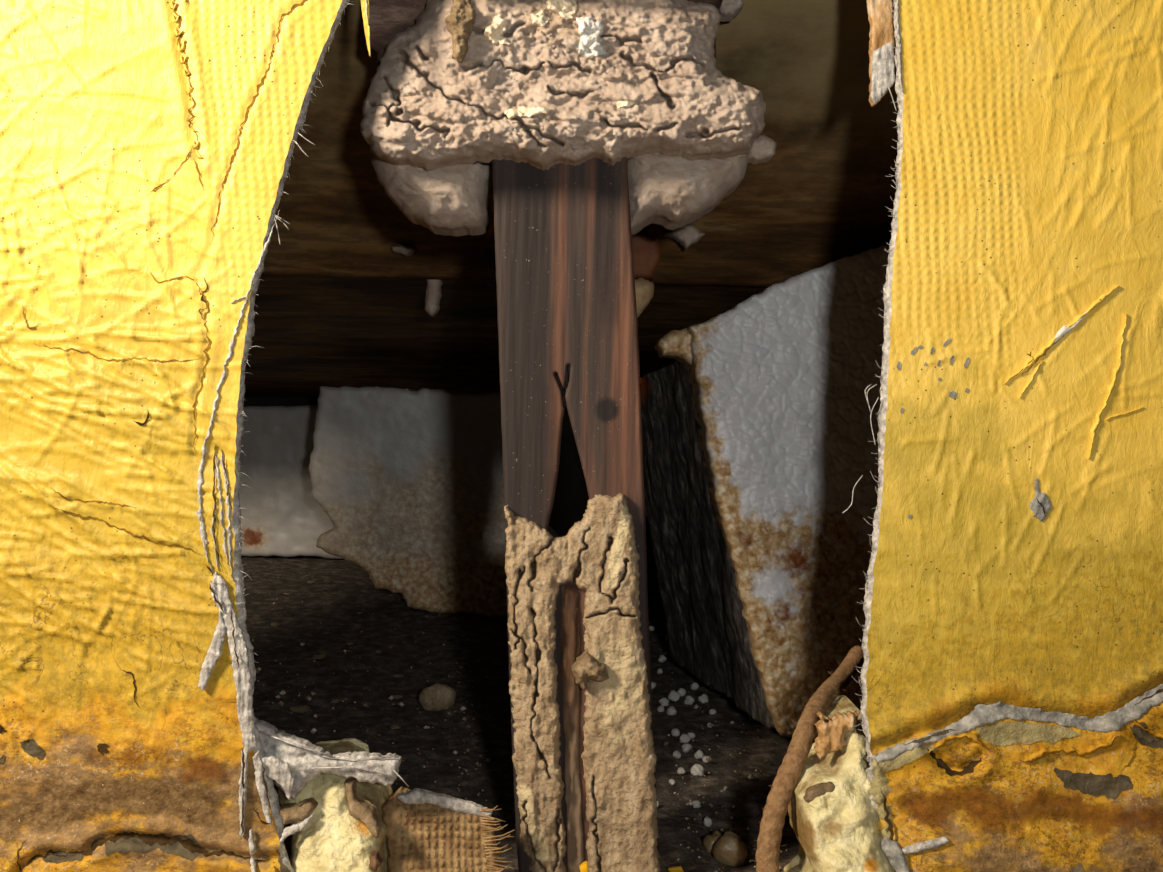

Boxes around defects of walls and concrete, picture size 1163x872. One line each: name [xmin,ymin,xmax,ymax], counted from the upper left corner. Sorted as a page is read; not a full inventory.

crack [210,0,307,244]
crack [22,271,211,457]
spalling [654,327,692,366]
crack [17,832,278,872]
peeling [344,777,383,872]
peeling [803,782,835,803]
crack [867,684,1163,841]